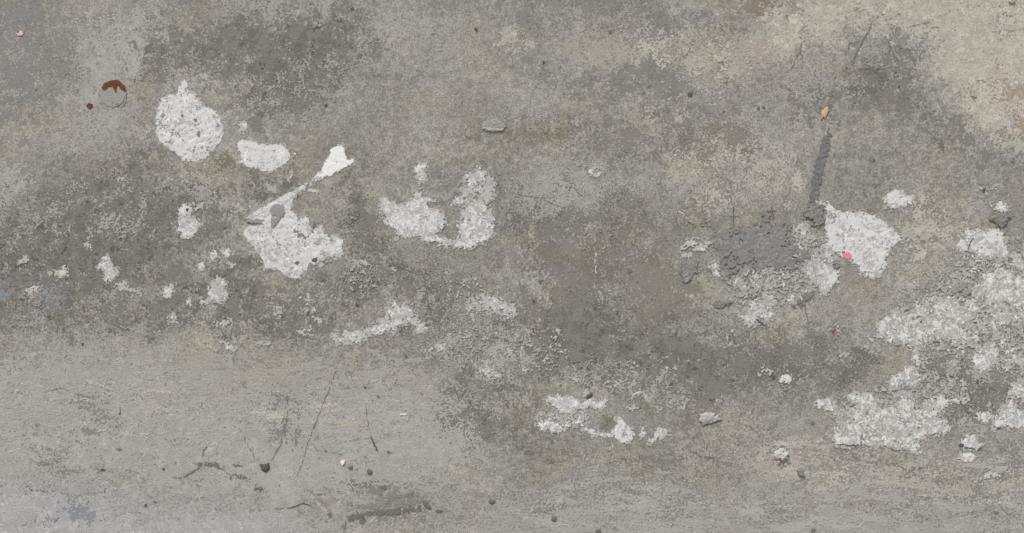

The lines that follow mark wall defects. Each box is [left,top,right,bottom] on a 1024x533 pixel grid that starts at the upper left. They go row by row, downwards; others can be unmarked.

corrosion [86,79,127,114]
damp [207,151,238,173]
damp [855,182,987,329]
crack [172,359,379,478]